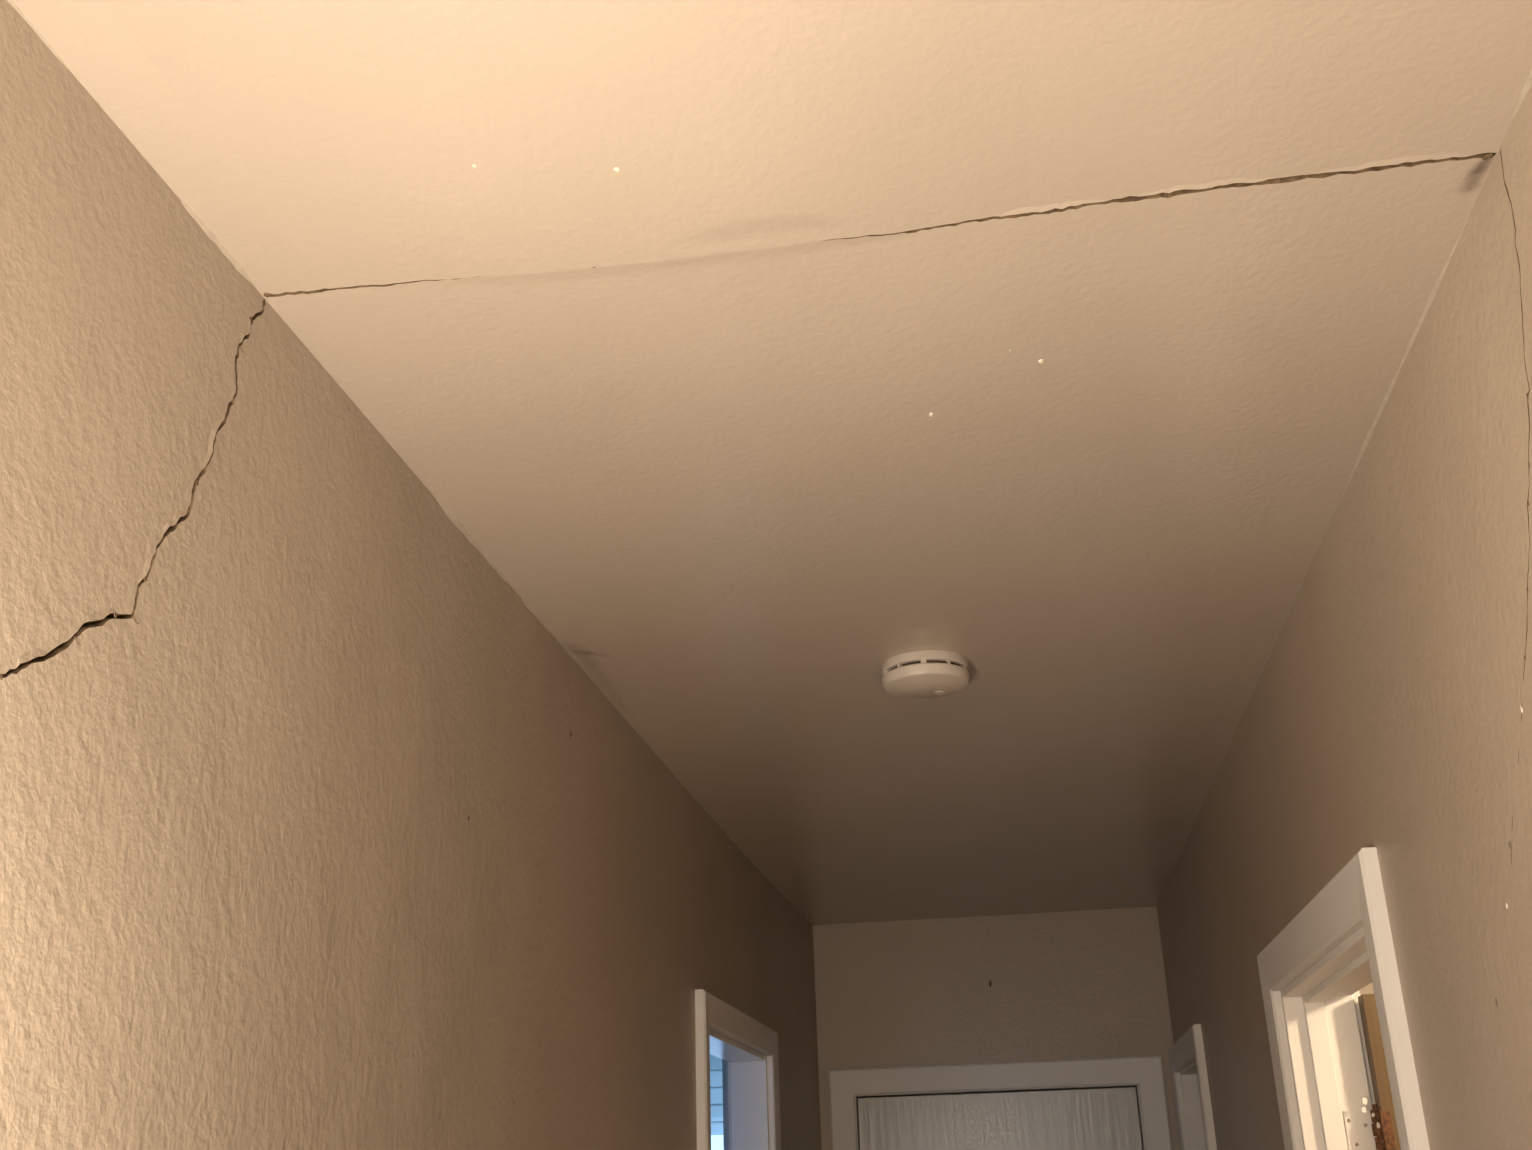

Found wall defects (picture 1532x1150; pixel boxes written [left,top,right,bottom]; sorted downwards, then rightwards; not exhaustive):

crack [0,276,480,680]
crack [794,150,1530,760]